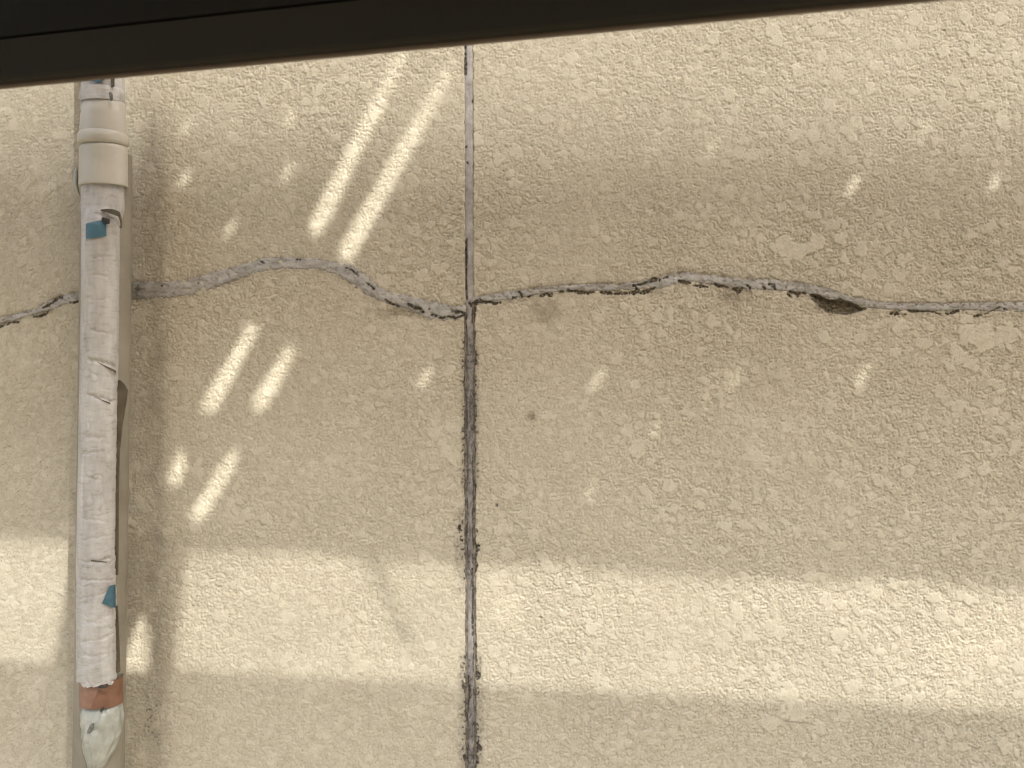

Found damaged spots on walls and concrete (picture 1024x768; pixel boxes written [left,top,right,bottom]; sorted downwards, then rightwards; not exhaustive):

crack [0,292,79,328]
crack [131,257,1024,321]
spalling [810,294,862,315]